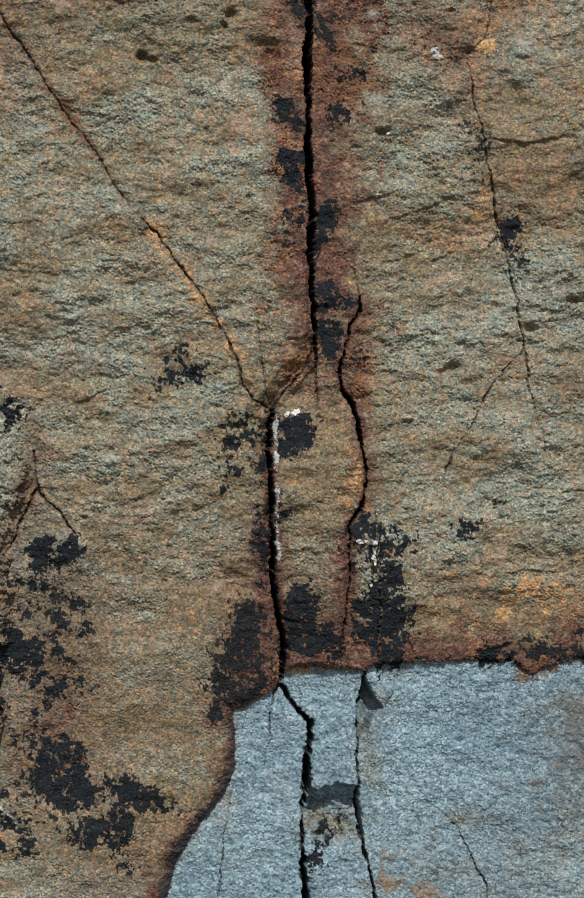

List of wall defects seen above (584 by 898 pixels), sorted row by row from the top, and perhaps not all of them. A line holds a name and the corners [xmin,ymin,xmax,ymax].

crack [0,0,383,898]
crack [442,0,555,512]
spalling [166,658,584,898]
crack [397,751,488,898]